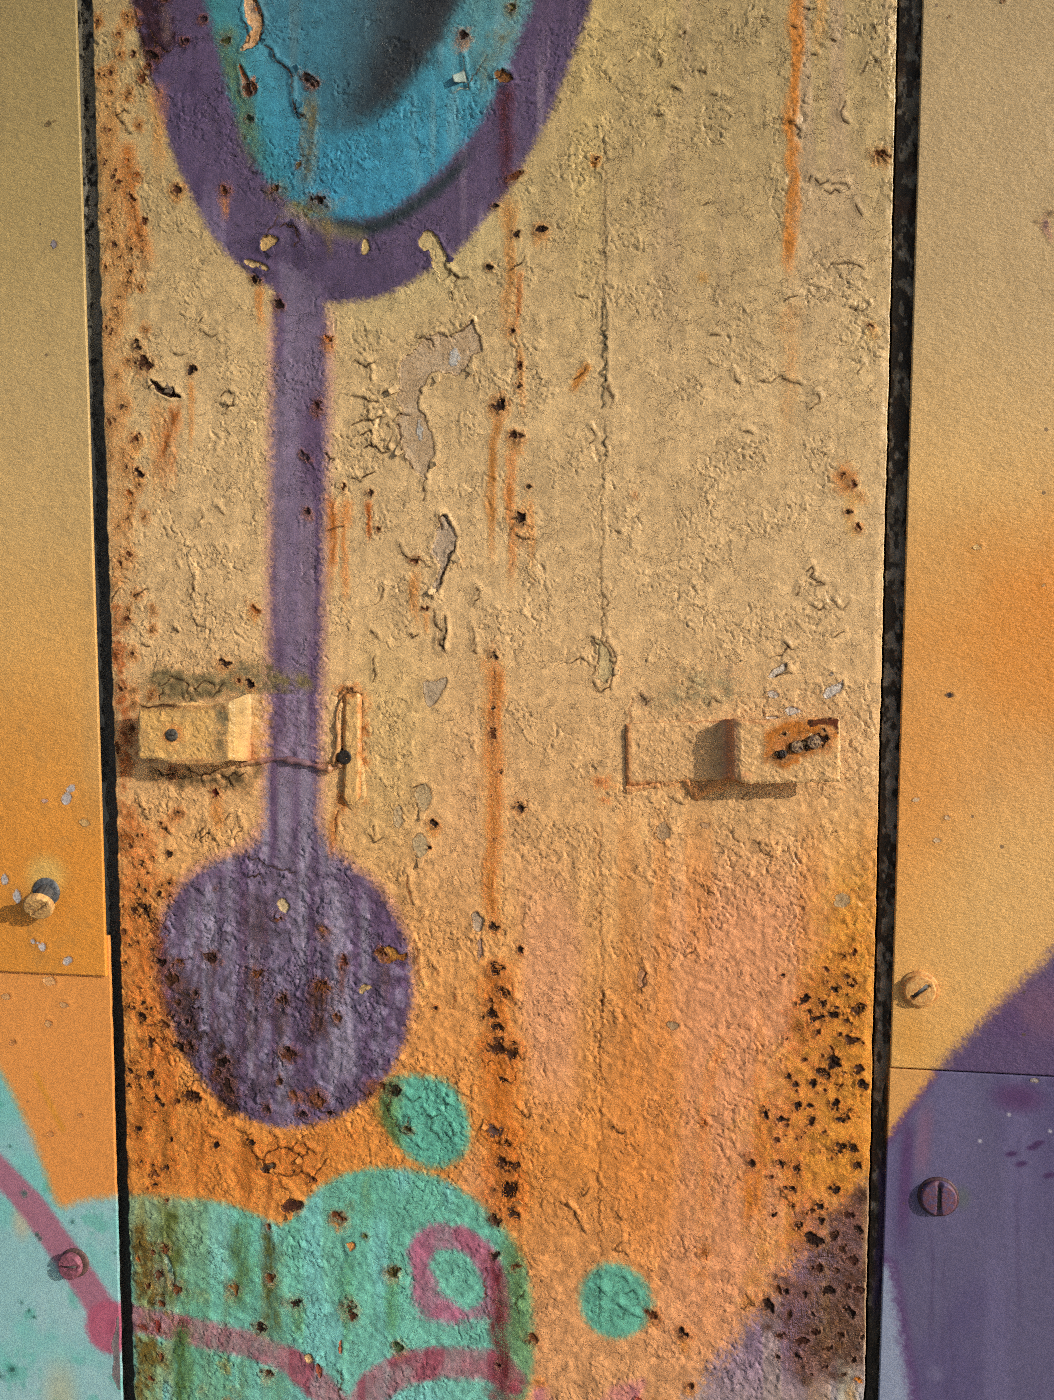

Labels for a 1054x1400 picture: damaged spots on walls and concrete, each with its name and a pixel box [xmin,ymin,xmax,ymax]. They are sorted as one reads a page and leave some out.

peeling [238,0,269,116]
peeling [388,320,482,501]
rust [485,68,550,570]
crack [579,142,621,639]
rust [93,0,335,1208]
peeling [427,514,462,654]
rust [763,717,839,769]
crack [236,1129,328,1192]
crack [403,1093,455,1150]
rust [477,960,530,1228]
rust [741,892,874,1400]
rust [131,1224,201,1400]